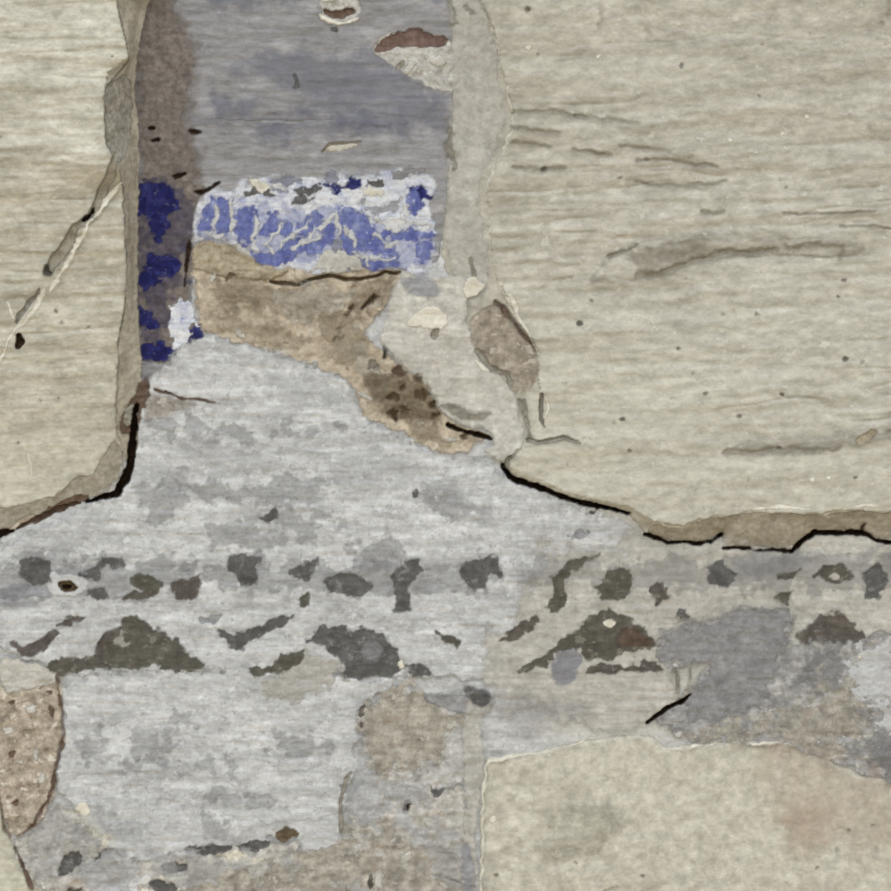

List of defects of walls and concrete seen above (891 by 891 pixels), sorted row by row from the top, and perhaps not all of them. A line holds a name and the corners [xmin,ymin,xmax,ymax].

crack [0,152,123,362]
peeling [0,0,492,530]
crack [0,404,139,538]
peeling [0,177,633,891]
crack [501,393,630,514]
crack [646,668,691,724]
peeling [484,503,891,783]
crack [644,524,891,553]